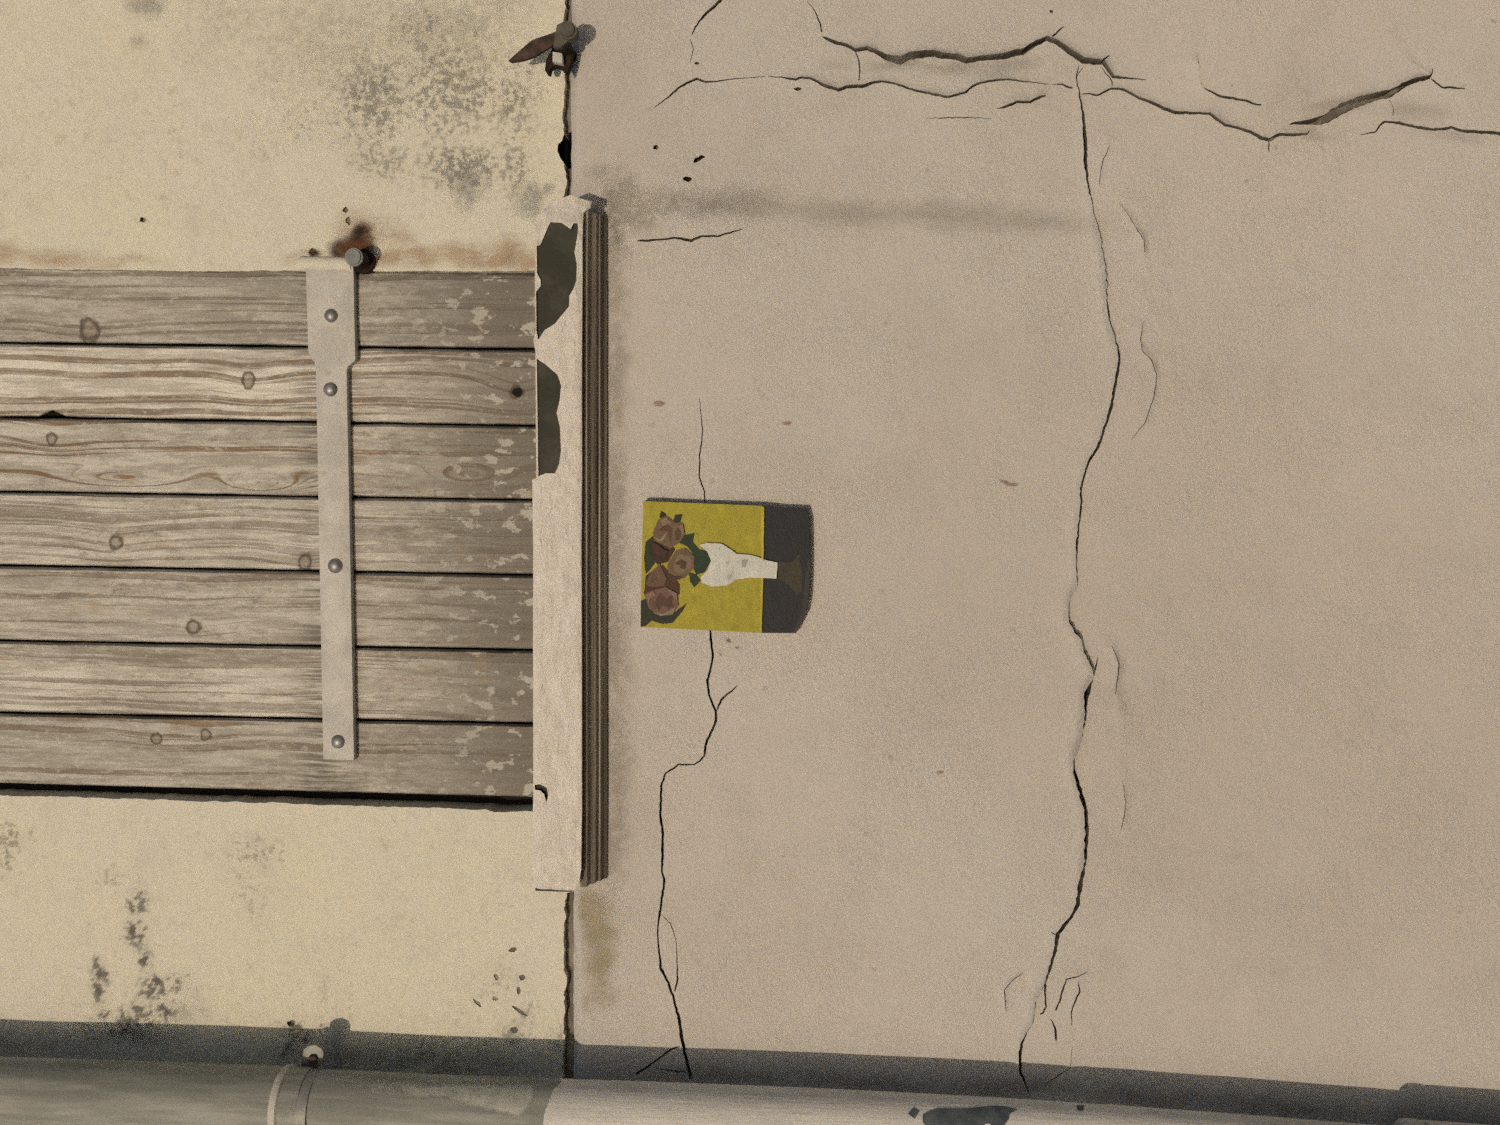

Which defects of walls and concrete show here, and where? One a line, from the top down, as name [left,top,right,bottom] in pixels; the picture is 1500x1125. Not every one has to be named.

rust [310,224,372,257]
peeling [536,222,578,340]
peeling [537,359,561,476]
crack [638,0,1500,1092]
crack [635,630,737,1080]
leakage [91,893,178,1036]